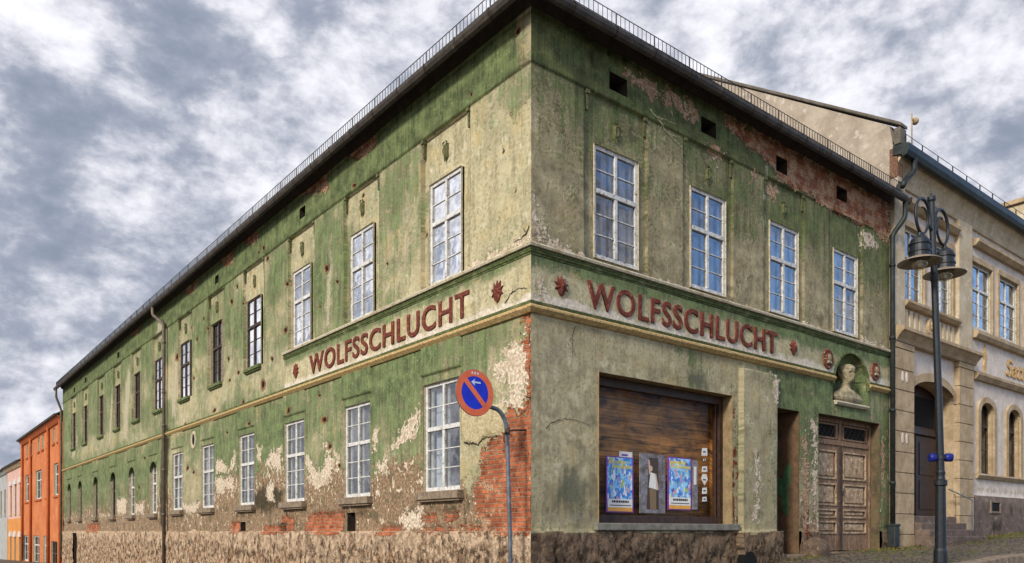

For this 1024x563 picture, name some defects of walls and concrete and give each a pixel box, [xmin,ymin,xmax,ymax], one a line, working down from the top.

peeling [621,66,699,124]
spalling [724,113,891,252]
flaking render [260,509,345,536]
flaking render [305,442,342,495]
flaking render [372,314,531,538]
peeling [800,418,818,530]